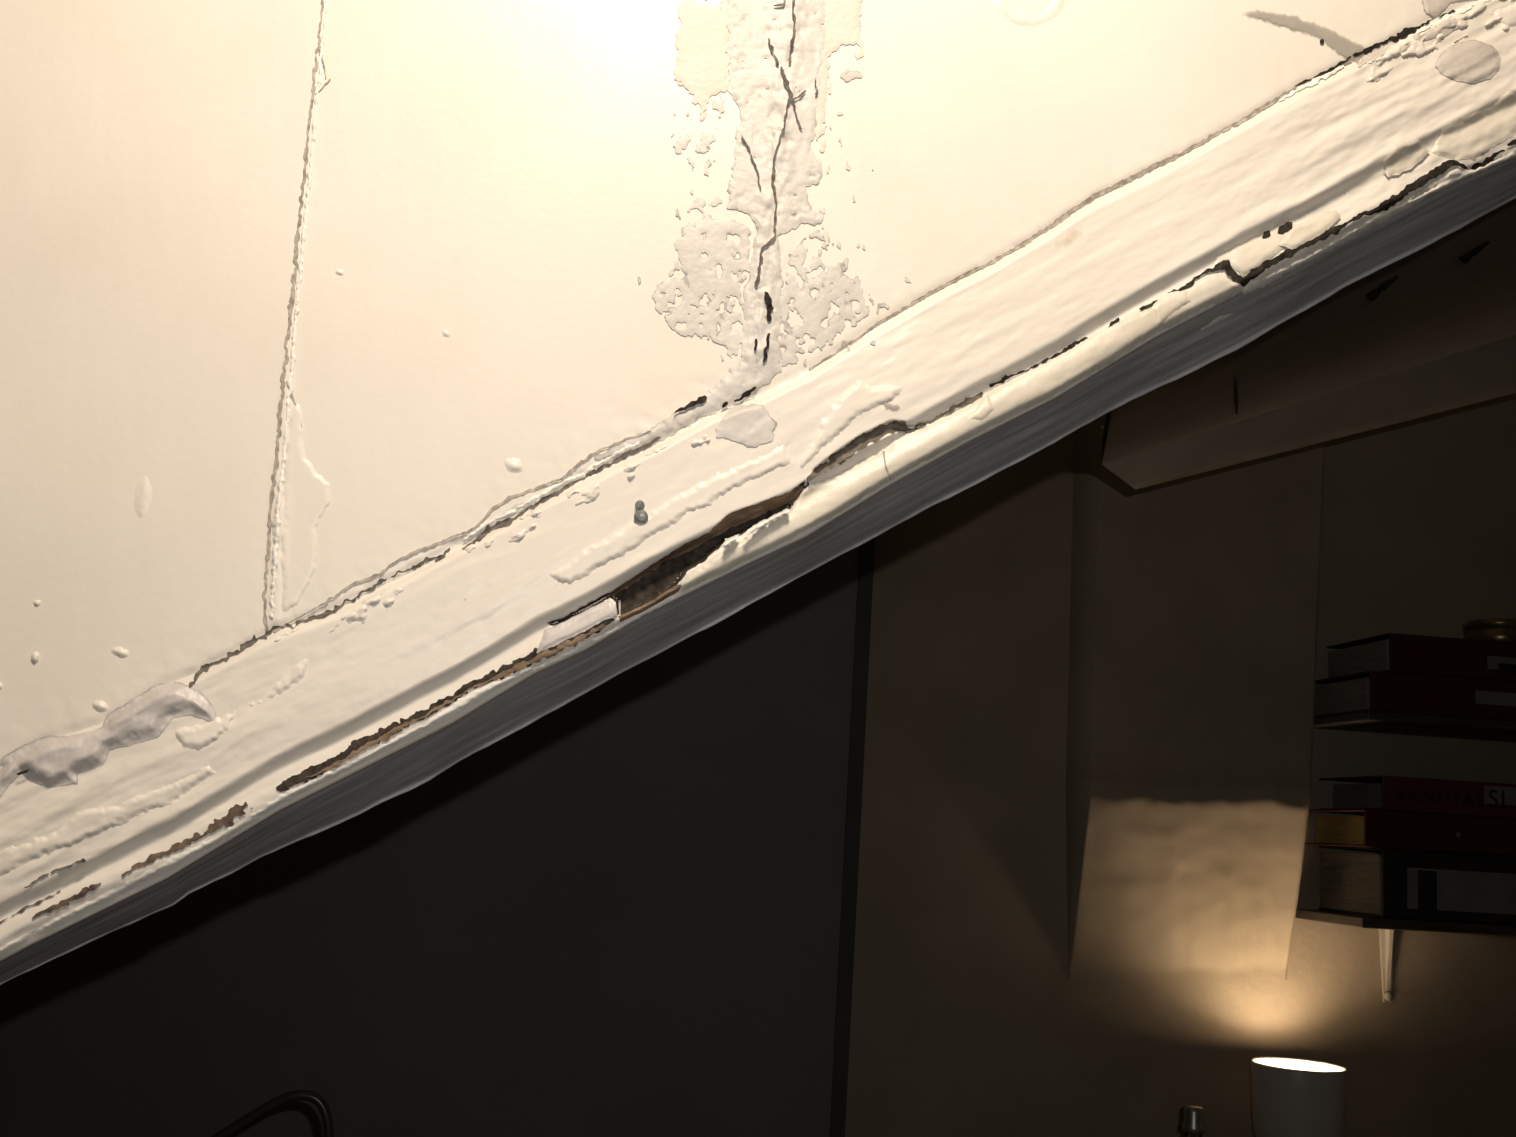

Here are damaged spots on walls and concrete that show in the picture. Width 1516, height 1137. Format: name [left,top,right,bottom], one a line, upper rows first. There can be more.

crack [189,0,818,687]
crack [0,139,1516,953]
peeling [840,69,862,82]
peeling [549,90,1516,592]
crack [809,0,1487,370]